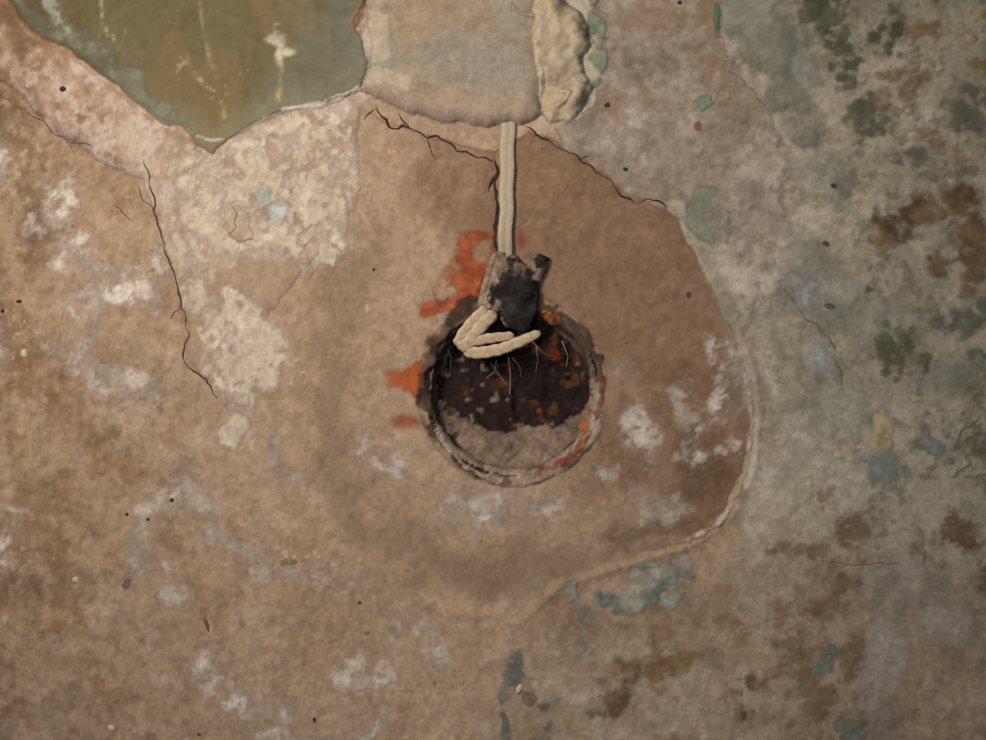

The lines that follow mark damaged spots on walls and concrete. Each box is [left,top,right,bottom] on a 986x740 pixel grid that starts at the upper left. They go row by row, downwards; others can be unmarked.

peeling [10,0,367,154]
mould [799,0,862,88]
mould [844,91,887,143]
mould [867,2,903,56]
crack [364,107,500,252]
crack [525,126,667,208]
crack [111,161,217,398]
rust [420,232,498,316]
spalling [318,0,787,591]
rust [388,361,423,396]
rust [538,343,605,475]
mould [878,320,931,381]